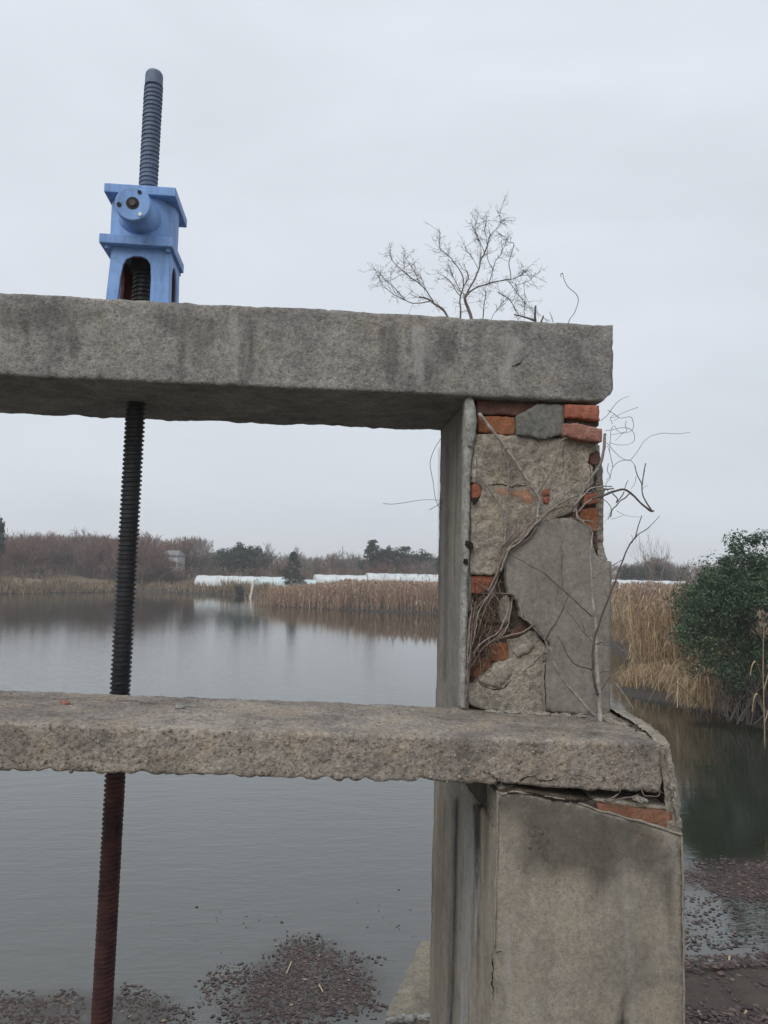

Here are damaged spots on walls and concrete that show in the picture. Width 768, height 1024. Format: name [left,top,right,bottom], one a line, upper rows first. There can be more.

spalling [475,400,536,436]
spalling [558,404,602,466]
spalling [471,483,481,505]
spalling [555,492,611,563]
peeling [463,540,537,688]
crack [478,653,546,710]
spalling [0,693,683,836]